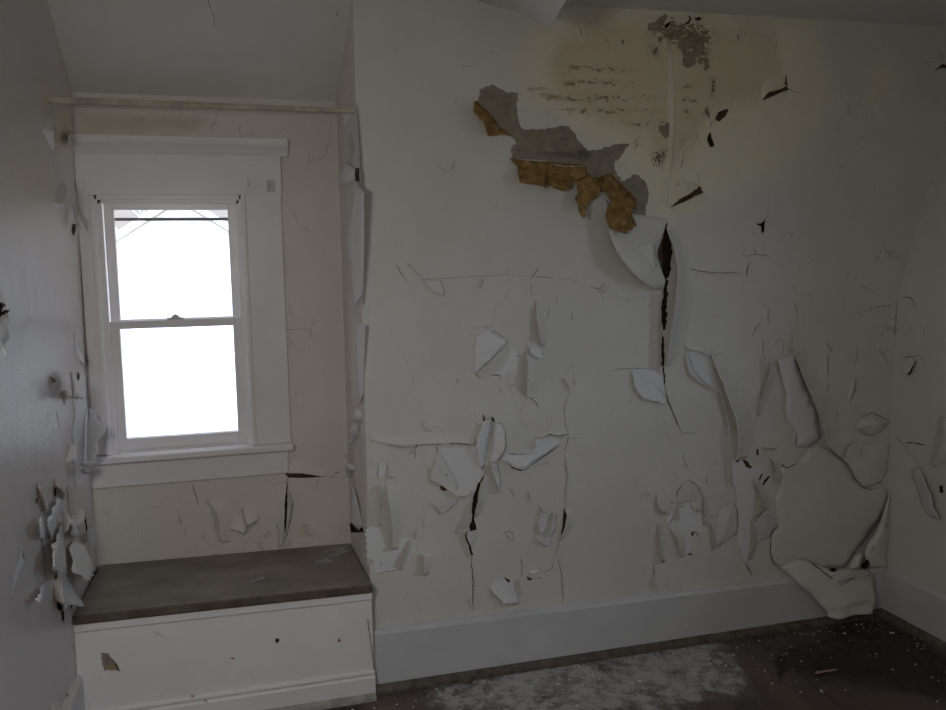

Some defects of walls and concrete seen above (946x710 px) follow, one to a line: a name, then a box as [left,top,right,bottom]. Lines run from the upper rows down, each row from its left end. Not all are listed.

peeling [478,0,572,28]
water stain [490,5,857,241]
spalling [473,84,667,290]
spalling [0,286,10,356]
peeling [776,331,846,457]
spalling [35,330,106,621]
peeling [430,430,569,497]
peeling [716,460,763,561]
peeling [780,492,892,619]